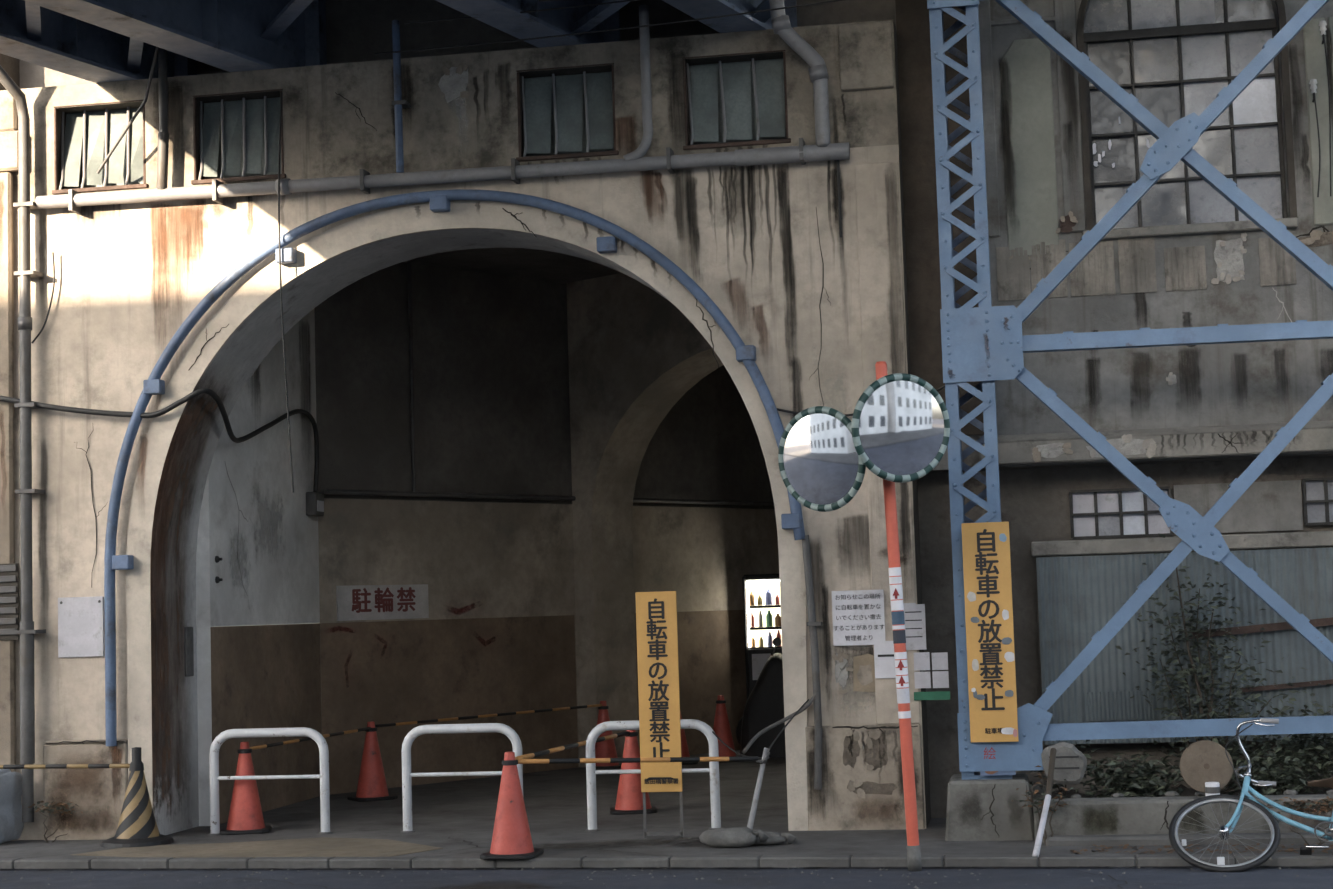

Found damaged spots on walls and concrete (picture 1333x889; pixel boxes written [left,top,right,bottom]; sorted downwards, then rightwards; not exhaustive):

damp [669,52,691,133]
rust [150,201,204,297]
damp [673,165,796,333]
peeling [1211,232,1247,284]
damp [1135,293,1147,322]
damp [792,361,802,418]
damp [1087,360,1099,404]
damp [1179,349,1200,397]
damp [1235,355,1247,395]
damp [1321,350,1333,379]